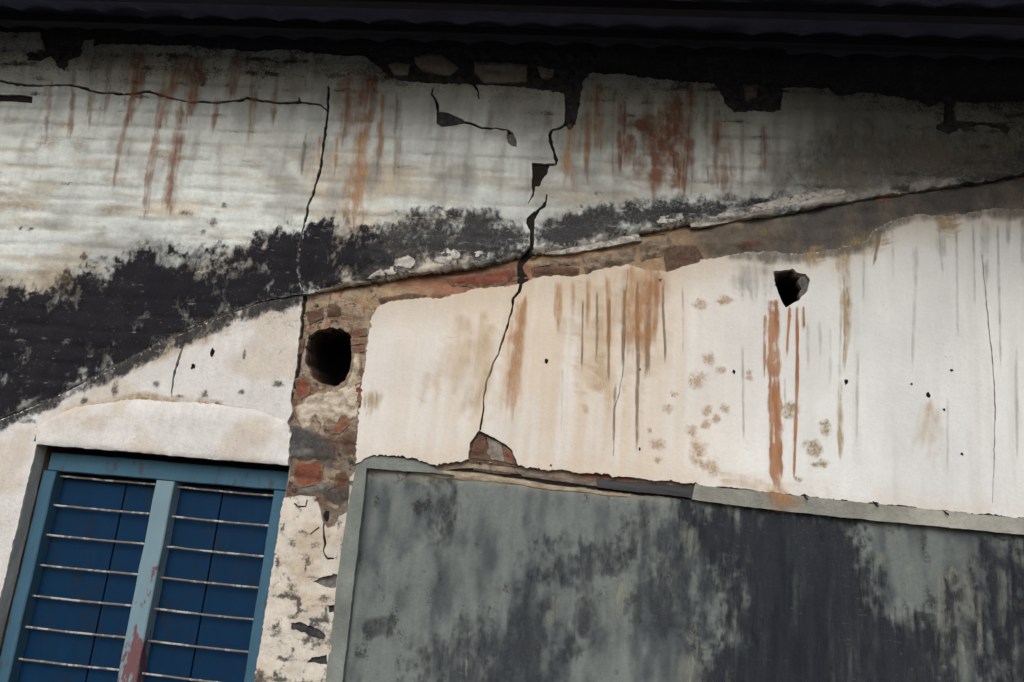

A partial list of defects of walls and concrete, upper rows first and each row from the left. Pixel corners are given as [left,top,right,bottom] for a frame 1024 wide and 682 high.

crack [463,122,511,135]
corrosion [617,87,693,189]
crack [0,81,330,399]
spalling [286,255,427,528]
leakage [0,128,1024,429]
corrosion [508,298,526,390]
crack [480,122,568,432]
spalling [413,431,694,500]
leakage [596,283,666,462]
corrosion [763,300,805,503]
spalling [774,272,809,307]
leakage [553,497,1024,682]